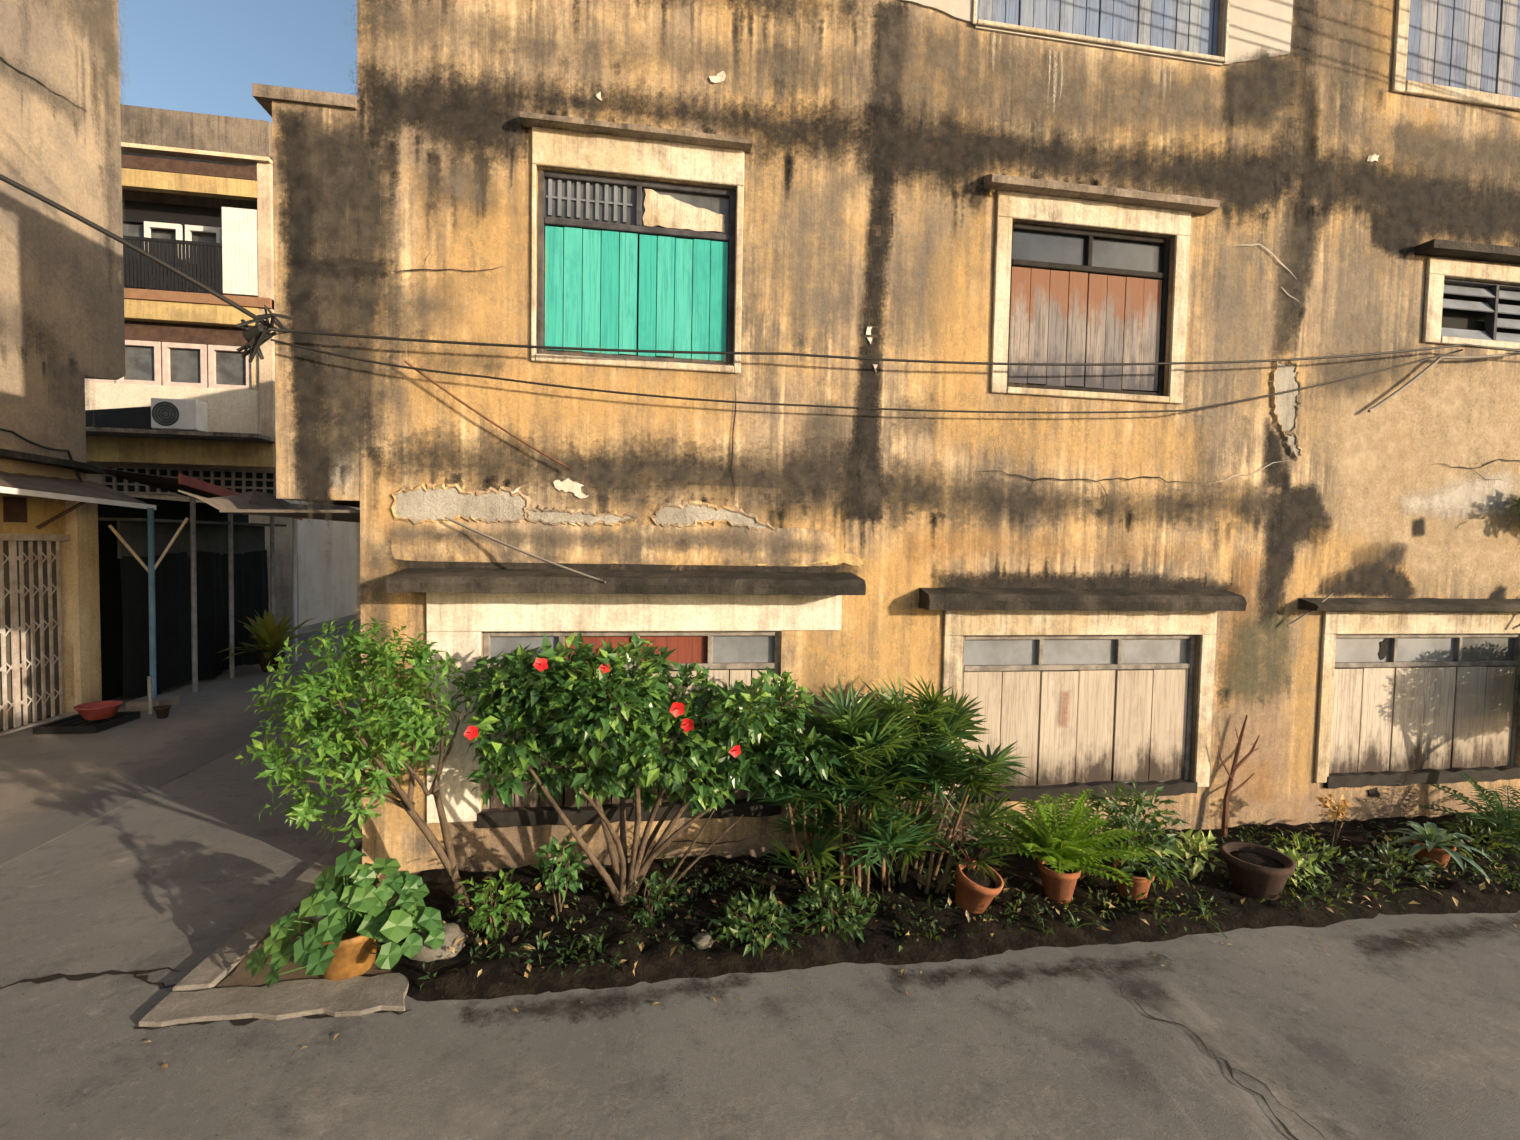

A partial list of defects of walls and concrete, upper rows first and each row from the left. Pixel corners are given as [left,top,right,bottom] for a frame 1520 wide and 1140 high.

water stain [276,0,1520,784]
peeling [373,469,779,533]
water stain [398,763,424,823]
crack [0,967,182,989]
crack [134,1018,258,1030]
crack [302,1012,333,1020]
crack [373,1008,412,1016]
crack [1109,971,1299,1140]